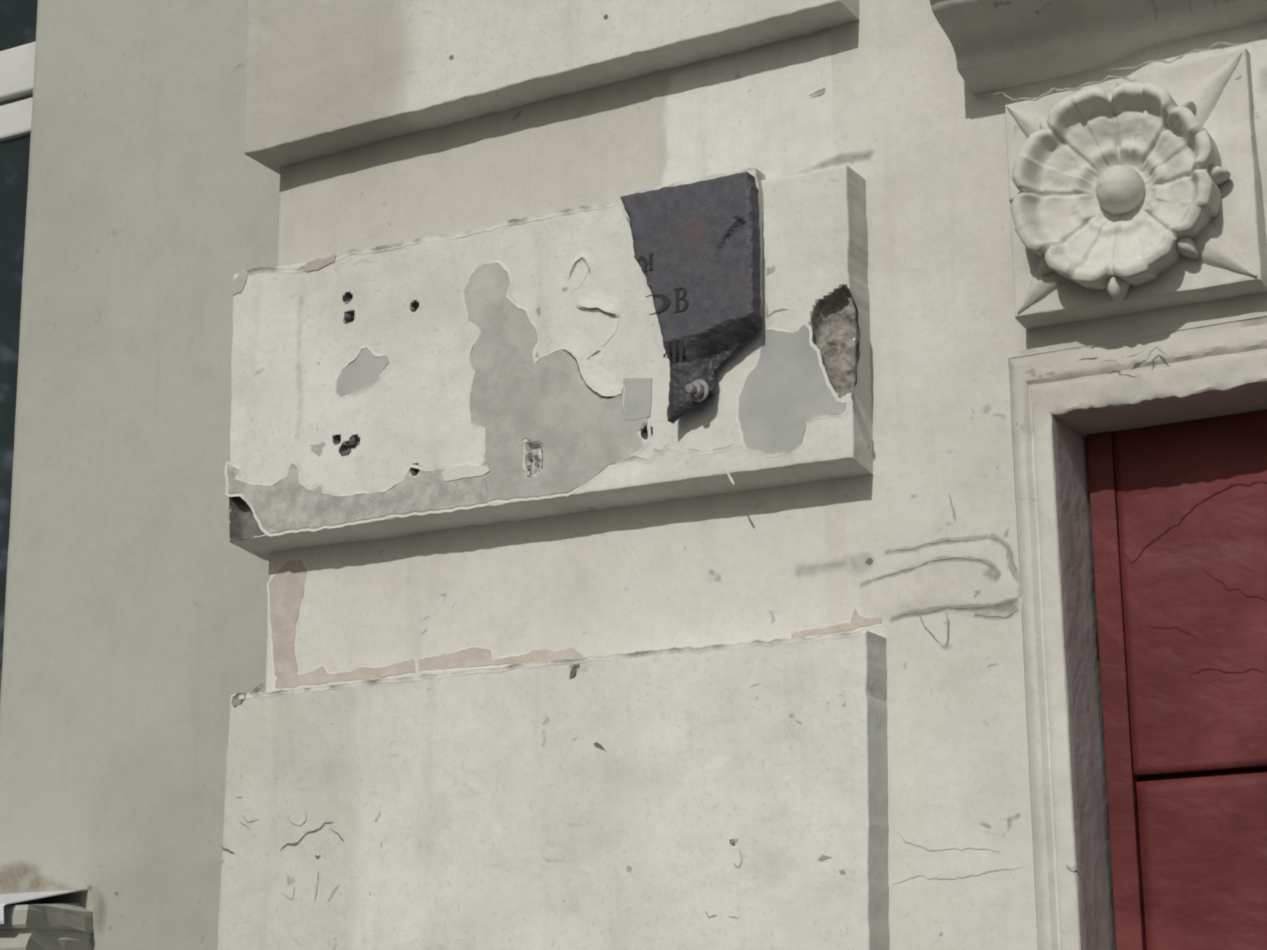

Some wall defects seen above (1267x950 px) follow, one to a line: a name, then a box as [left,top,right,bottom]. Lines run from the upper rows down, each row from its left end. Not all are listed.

peeling [232,199,620,296]
peeling [225,249,859,541]
crack [1126,481,1267,563]
peeling [231,557,885,706]
crack [916,610,949,646]
crack [1190,666,1267,674]